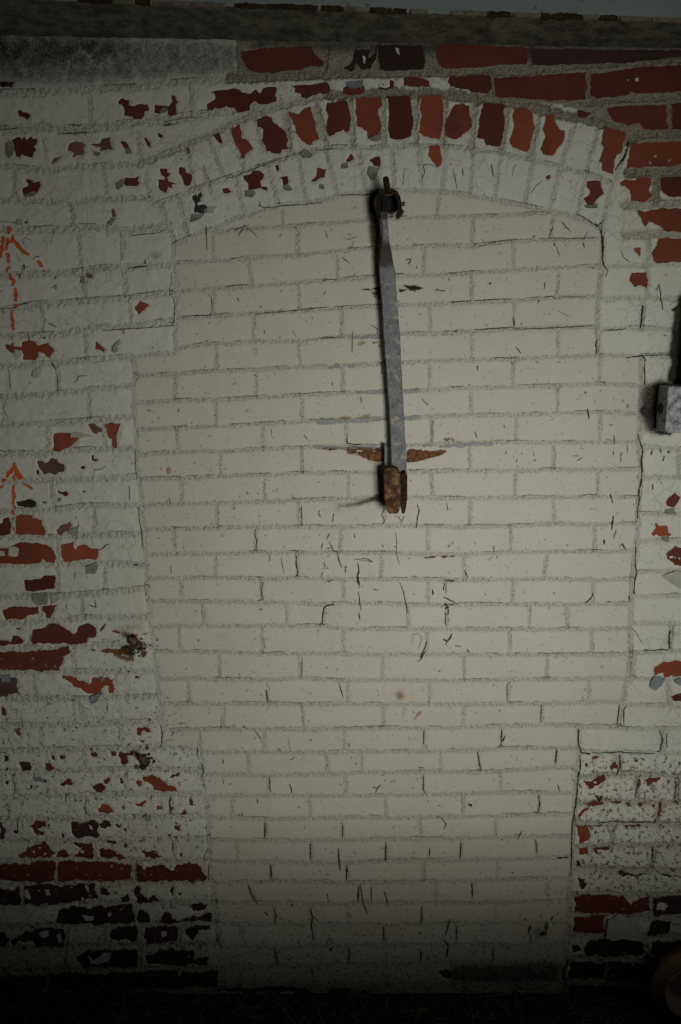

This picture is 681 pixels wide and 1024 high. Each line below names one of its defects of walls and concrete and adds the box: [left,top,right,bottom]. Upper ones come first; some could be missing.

peeling [158,167,217,222]
peeling [207,44,681,264]
corrosion [323,446,384,462]
corrosion [406,438,454,462]
crack [636,435,644,519]
peeling [651,493,681,566]
peeling [0,491,151,716]
corrosion [92,648,147,661]
peeling [650,658,681,701]
crack [535,729,677,872]
peeling [0,777,219,993]
peeling [568,762,681,983]